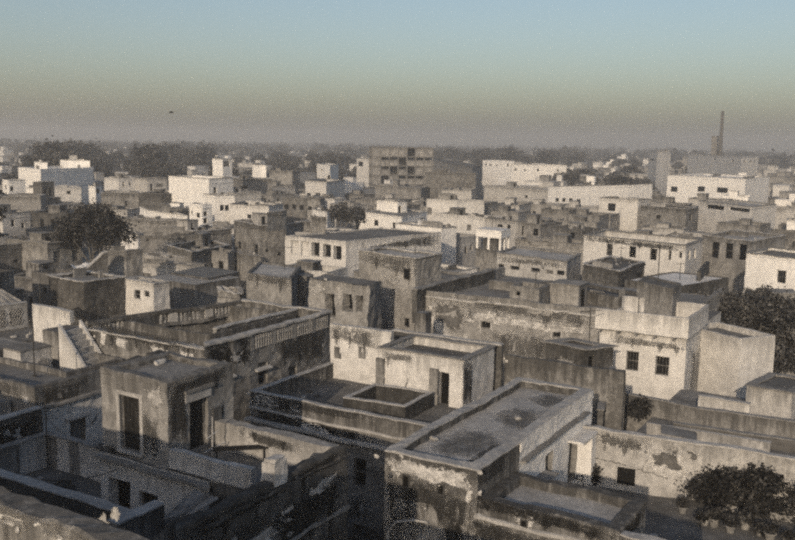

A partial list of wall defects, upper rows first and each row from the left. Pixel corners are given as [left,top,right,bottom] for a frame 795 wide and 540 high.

damp [499,410,535,428]
peeling [0,510,23,534]
damp [193,457,339,540]
damp [249,432,292,452]
peeling [251,504,294,540]
peeling [309,471,339,496]
peeling [374,454,482,503]
damp [389,480,537,540]
damp [438,432,497,461]
damp [480,456,504,485]
damp [480,497,600,540]
peeling [634,444,697,478]